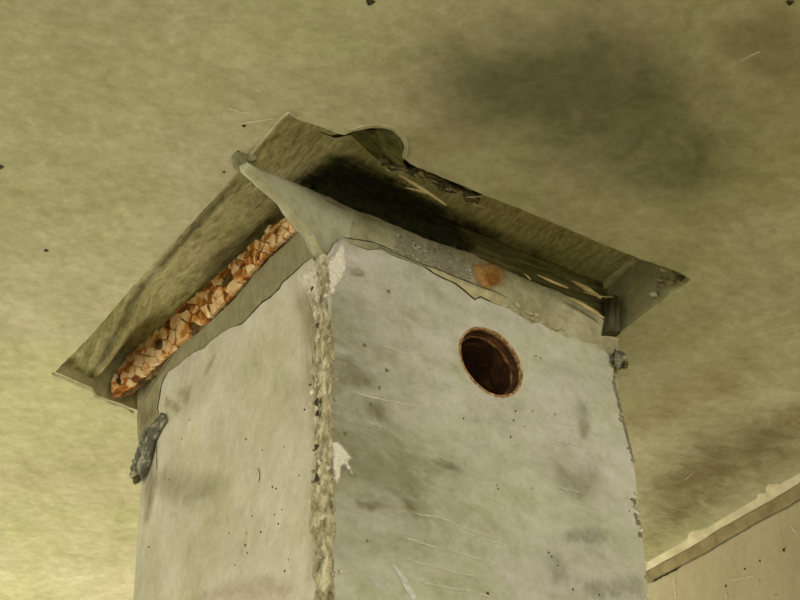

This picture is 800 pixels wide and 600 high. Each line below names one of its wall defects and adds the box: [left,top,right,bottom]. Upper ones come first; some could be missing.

water stain [295,157,493,252]
spalling [321,123,485,208]
corrosion [473,263,506,288]
peeling [426,265,565,331]
spalling [111,167,347,600]